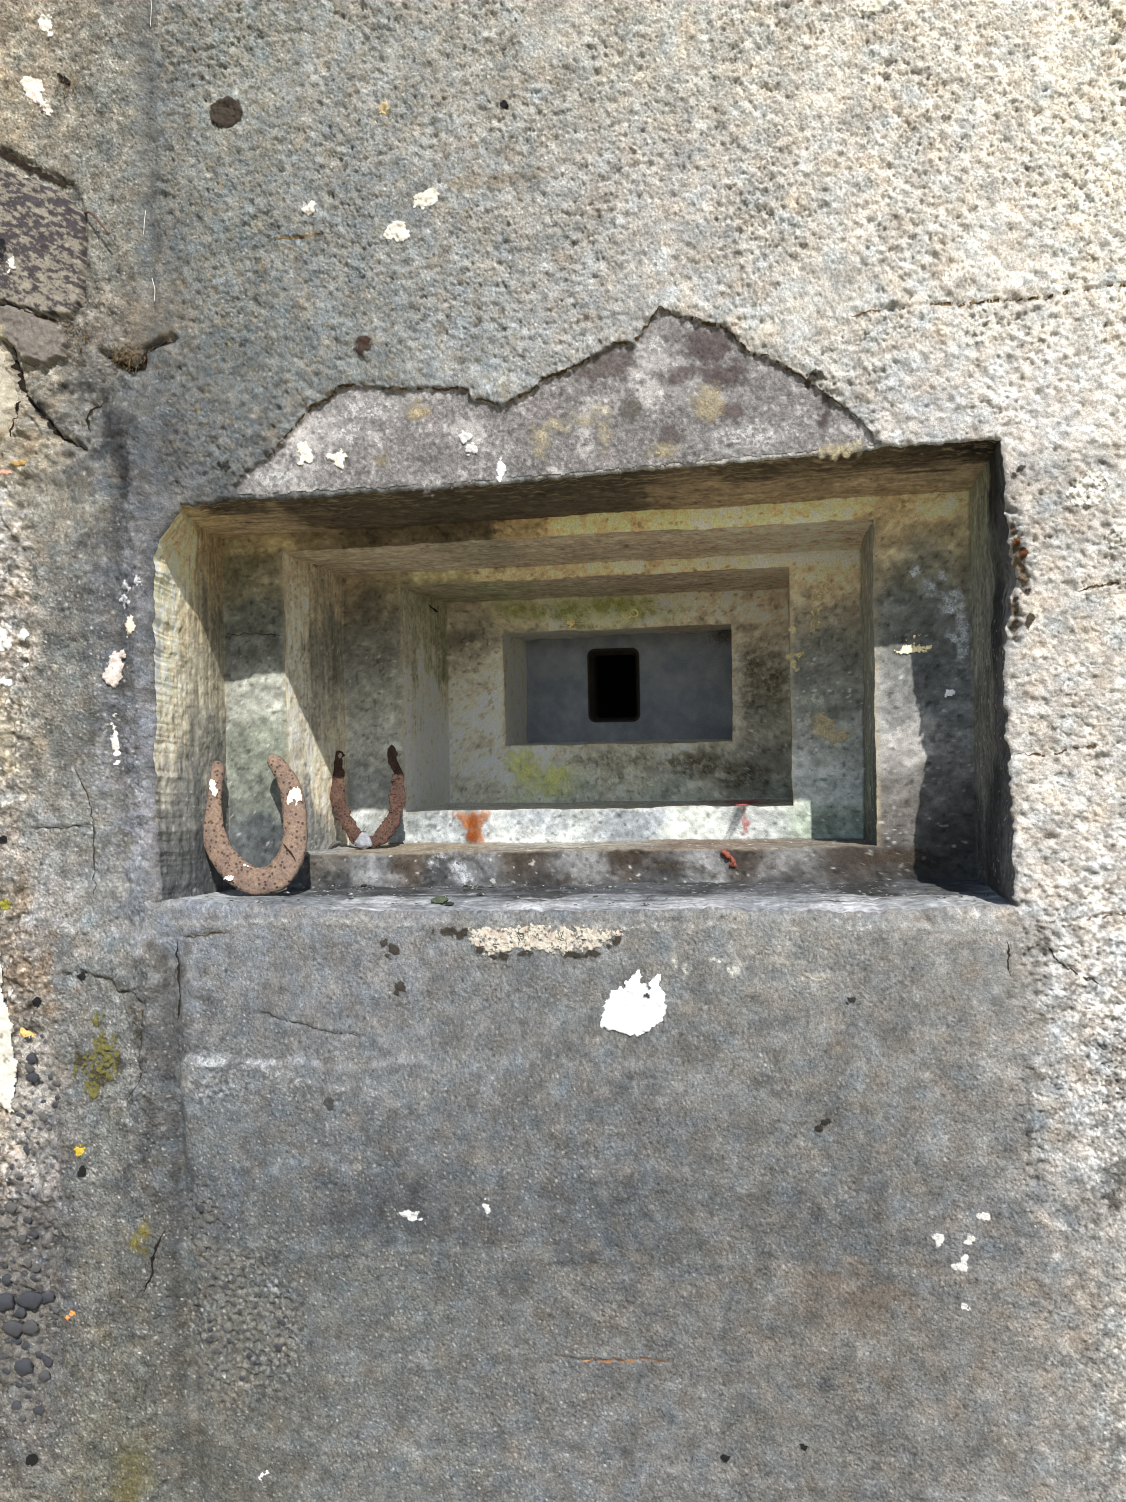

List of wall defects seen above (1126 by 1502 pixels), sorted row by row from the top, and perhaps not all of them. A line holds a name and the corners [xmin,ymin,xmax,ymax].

crack [850,284,1126,317]
crack [106,341,176,372]
crack [9,347,107,450]
spalling [233,306,882,495]
crack [141,1231,165,1298]